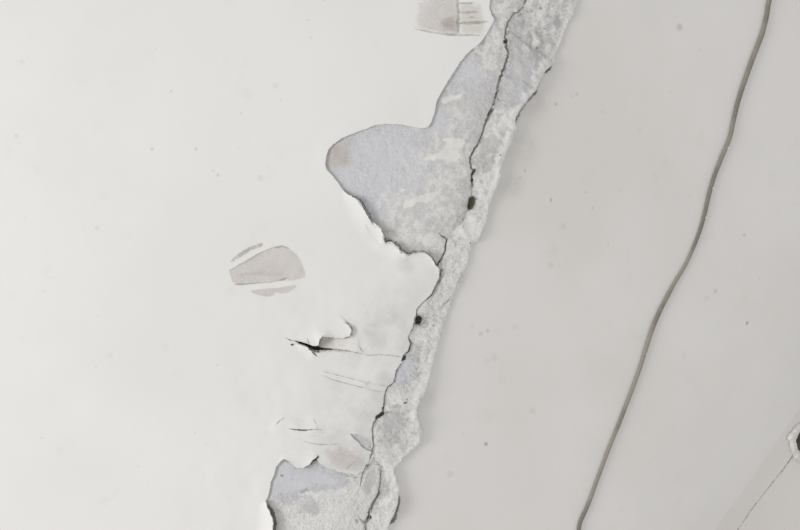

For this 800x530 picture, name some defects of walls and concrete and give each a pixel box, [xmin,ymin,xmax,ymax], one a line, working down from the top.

crack [469,0,527,187]
leakage [229,243,305,297]
crack [341,215,464,530]
flaking render [256,0,579,530]